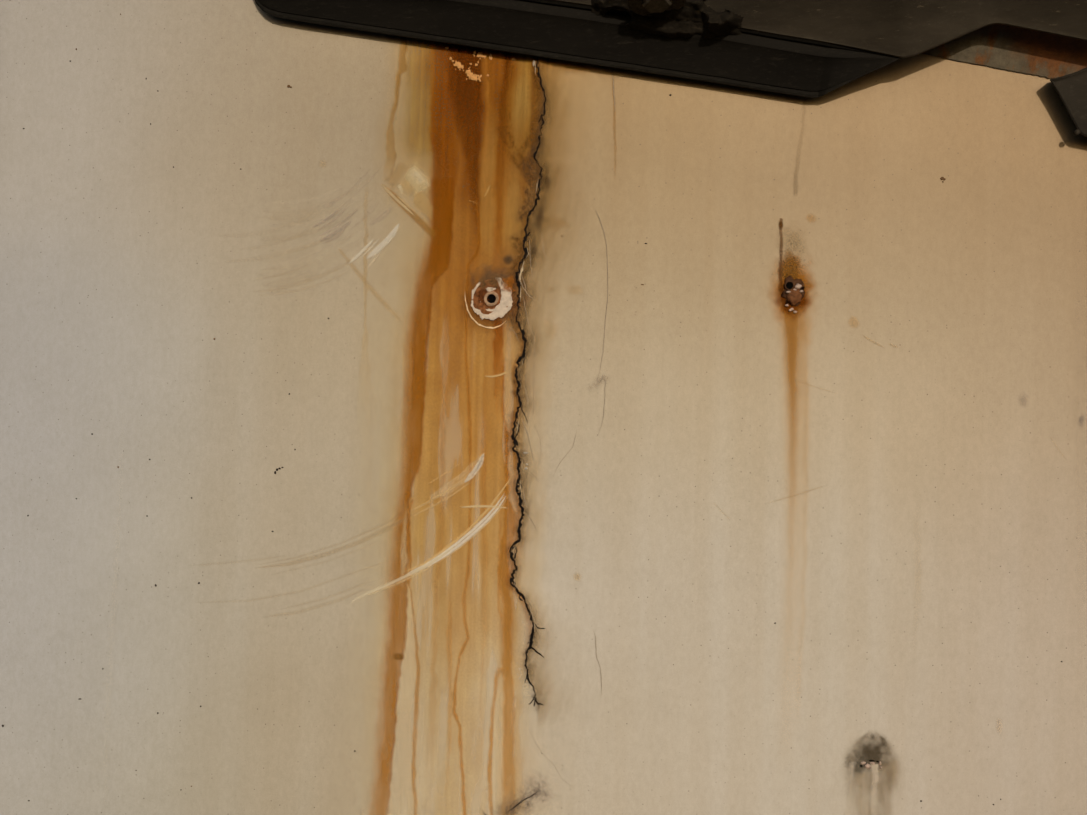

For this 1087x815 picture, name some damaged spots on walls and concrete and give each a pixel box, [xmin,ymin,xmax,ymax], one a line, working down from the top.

rust [380,39,551,815]
crack [483,57,608,815]
rust [777,221,812,434]